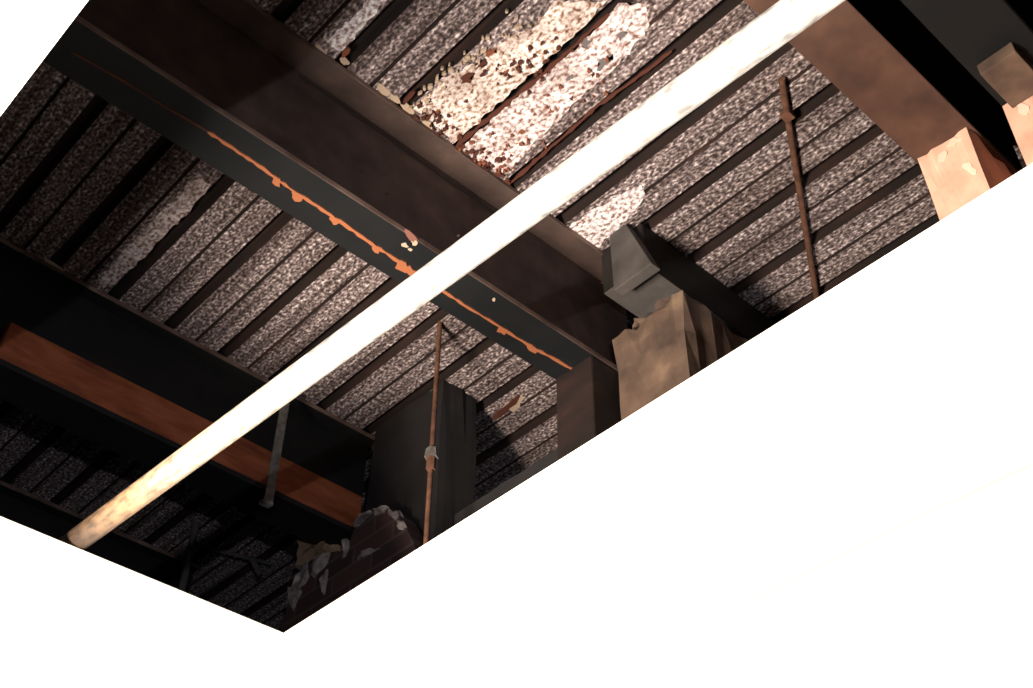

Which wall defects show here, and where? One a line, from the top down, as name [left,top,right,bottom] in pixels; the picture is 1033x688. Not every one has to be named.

peeling [378,0,649,174]
rust [403,13,672,185]
rust [442,290,573,370]